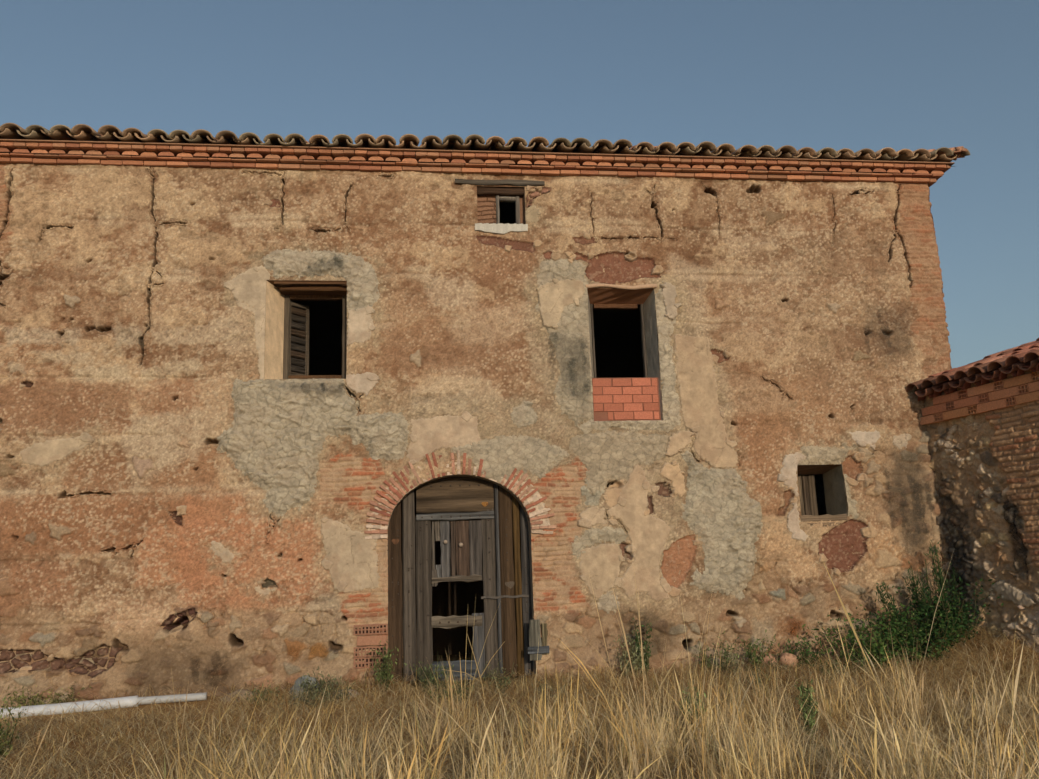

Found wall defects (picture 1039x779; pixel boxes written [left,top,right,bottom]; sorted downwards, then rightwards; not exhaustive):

crack [0,166,15,309]
crack [37,223,75,243]
crack [136,166,188,366]
spalling [475,233,682,330]
crack [589,184,679,243]
crack [830,183,914,290]
flaking render [346,372,380,396]
flaking render [577,334,738,602]
spalling [777,452,878,576]
spalling [842,430,912,505]
spalling [0,644,123,678]
spalling [161,607,202,638]